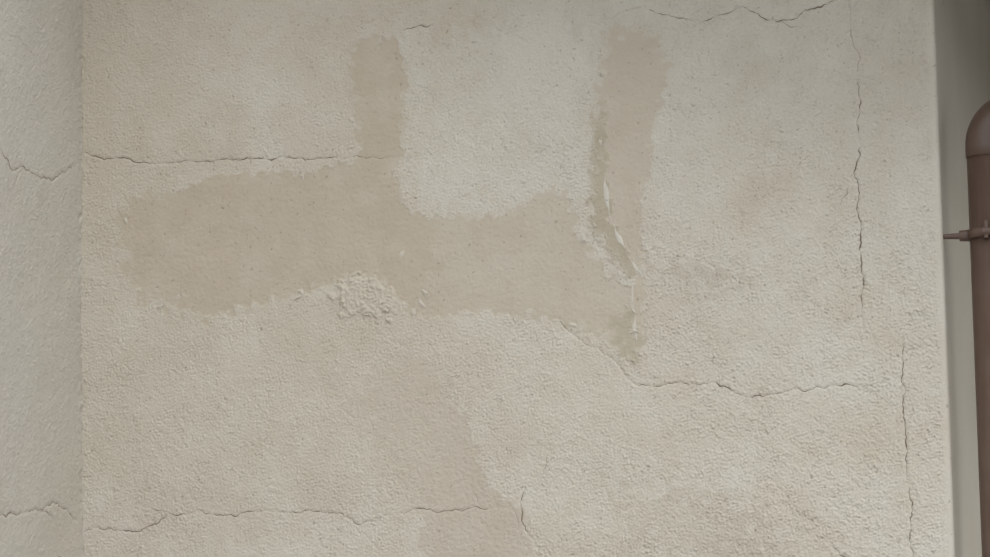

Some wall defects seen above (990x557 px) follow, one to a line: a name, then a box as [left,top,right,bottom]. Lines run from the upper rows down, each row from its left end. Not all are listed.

peeling [391,13,676,353]
crack [705,2,864,308]
water stain [596,308,649,365]